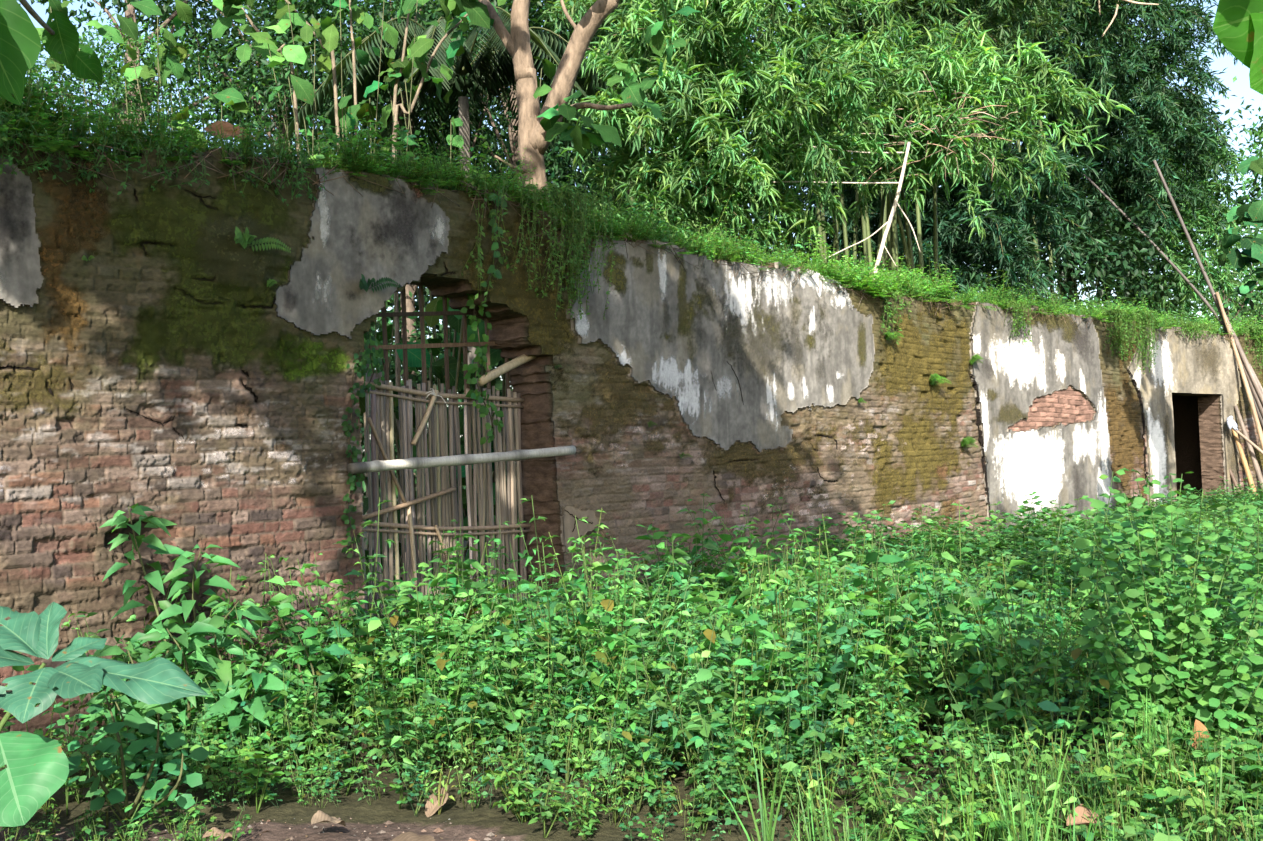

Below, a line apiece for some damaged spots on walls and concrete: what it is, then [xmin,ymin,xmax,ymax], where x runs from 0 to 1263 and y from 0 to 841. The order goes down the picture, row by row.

leakage [0,176,29,252]
peeling [0,156,44,308]
leakage [318,186,329,242]
peeling [273,164,450,339]
leakage [373,195,419,247]
leakage [431,217,444,246]
peeling [566,231,875,452]
leakage [858,324,866,365]
peeling [969,302,1116,535]
peeling [1126,327,1241,507]